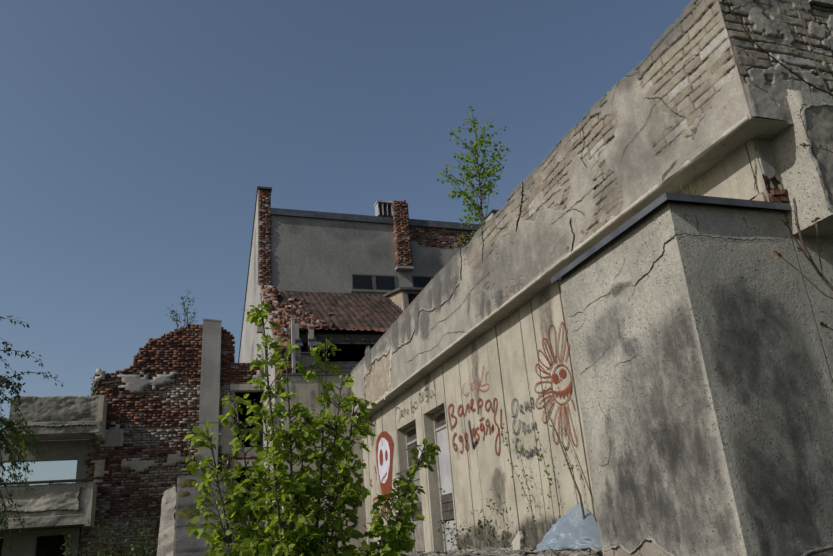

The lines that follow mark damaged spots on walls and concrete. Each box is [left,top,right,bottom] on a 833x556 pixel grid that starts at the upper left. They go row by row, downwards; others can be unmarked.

spalling [749,149,788,203]
crack [362,179,606,437]
crack [567,216,782,331]
peeling [364,349,392,408]